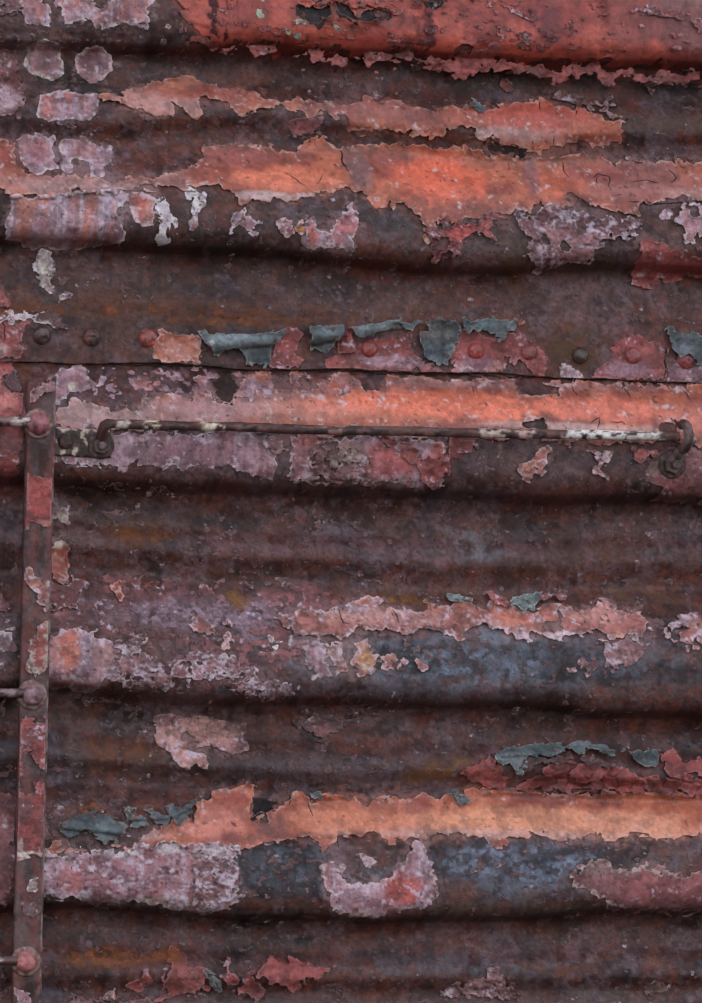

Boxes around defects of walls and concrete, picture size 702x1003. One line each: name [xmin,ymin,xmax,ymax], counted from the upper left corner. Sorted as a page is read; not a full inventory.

rust [60,947,180,969]
peeling [0,514,702,1003]